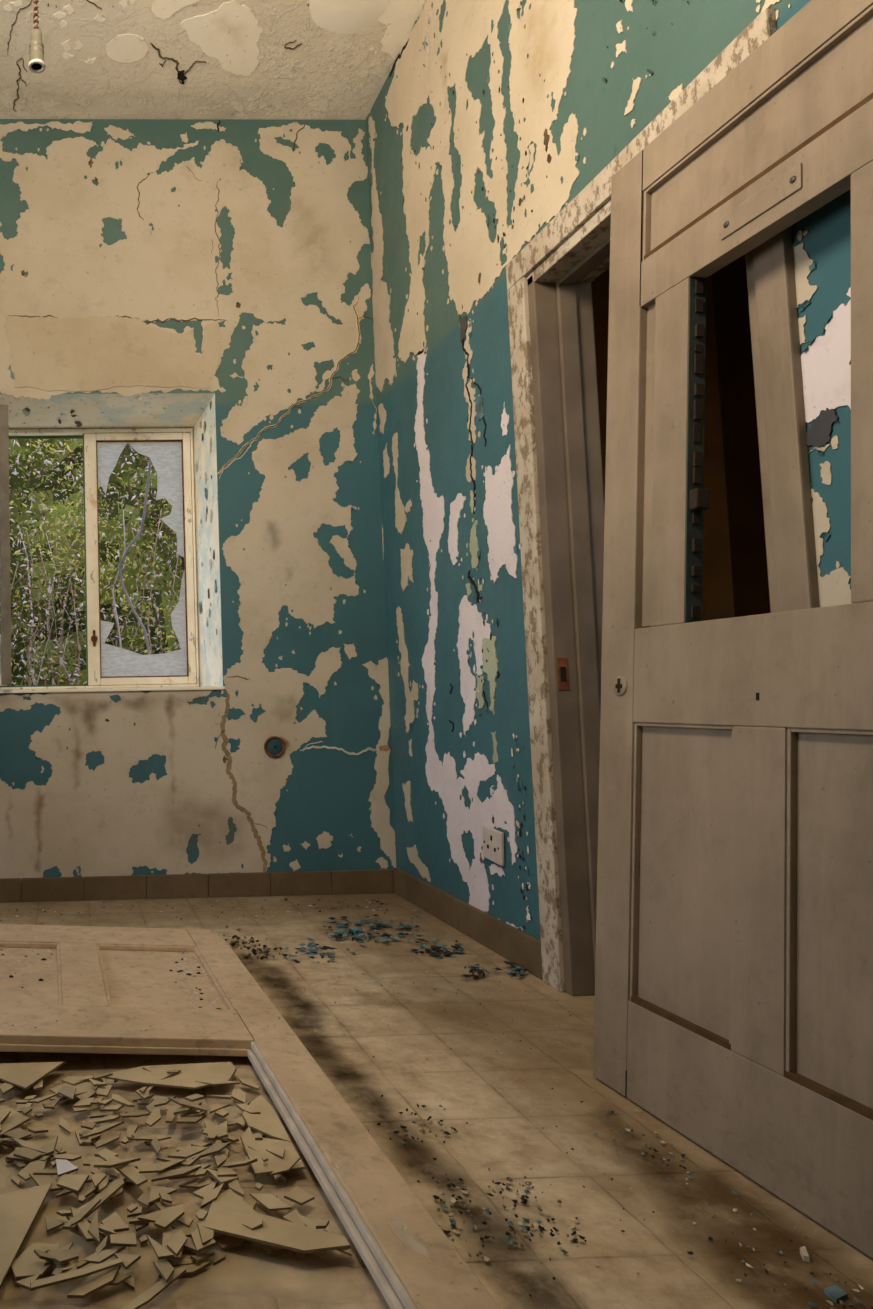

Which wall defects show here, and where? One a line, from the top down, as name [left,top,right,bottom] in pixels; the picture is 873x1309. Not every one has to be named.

crack [7,1,31,112]
crack [150,43,207,84]
peeling [611,0,633,69]
peeling [624,74,651,128]
peeling [668,83,683,102]
peeling [756,0,791,21]
peeling [792,230,852,607]
peeling [0,0,587,930]
crack [215,676,268,872]
peeling [492,961,528,978]